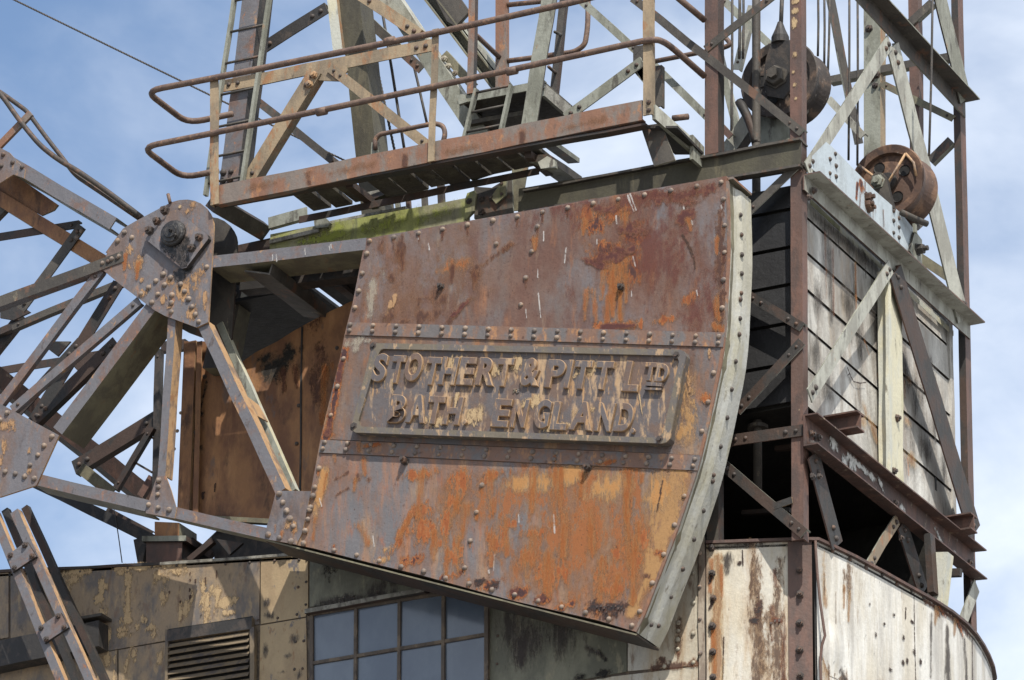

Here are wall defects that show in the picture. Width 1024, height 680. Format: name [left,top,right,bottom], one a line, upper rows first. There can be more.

leakage [297,226,374,244]
rust [378,234,406,282]
rust [383,241,514,325]
rust [530,182,727,332]
peeling [471,355,522,381]
peeling [424,392,483,428]
peeling [521,394,549,409]
rust [312,441,381,541]
rust [374,455,687,619]
leakage [723,543,763,575]
peeling [61,560,239,680]
leakage [843,563,853,622]